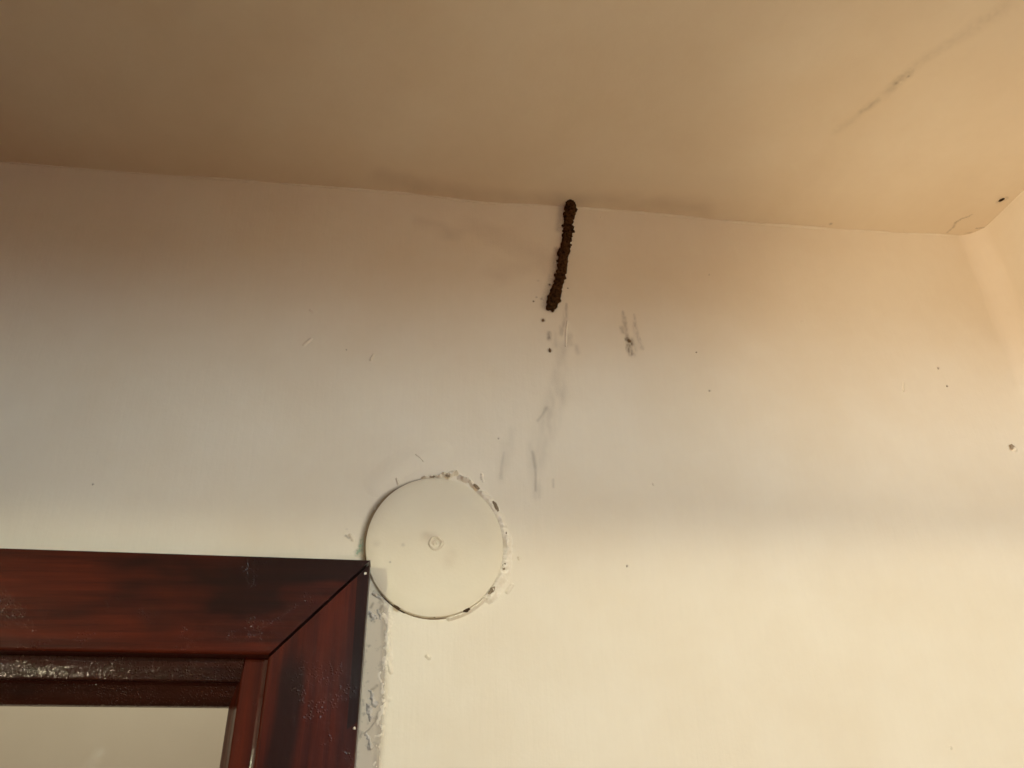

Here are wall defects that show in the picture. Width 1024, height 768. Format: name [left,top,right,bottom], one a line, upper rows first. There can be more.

peeling [356,578,395,768]